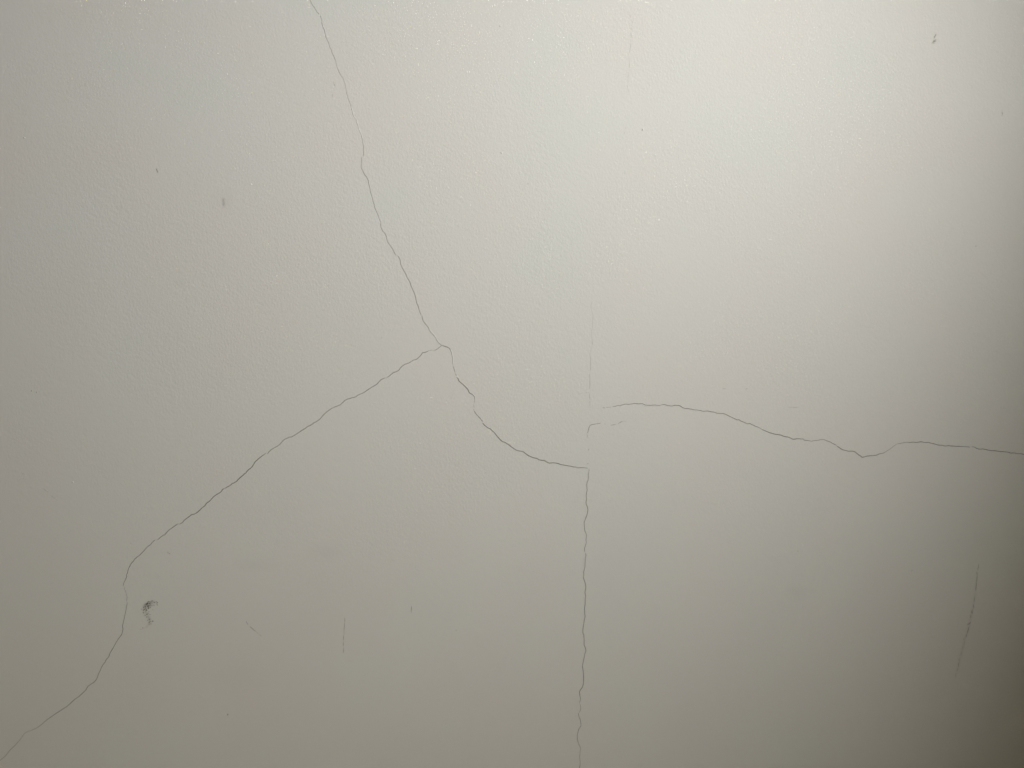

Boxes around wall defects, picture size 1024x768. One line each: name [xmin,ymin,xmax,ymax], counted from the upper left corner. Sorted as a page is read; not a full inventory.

crack [3,3,589,768]
crack [587,403,1024,458]